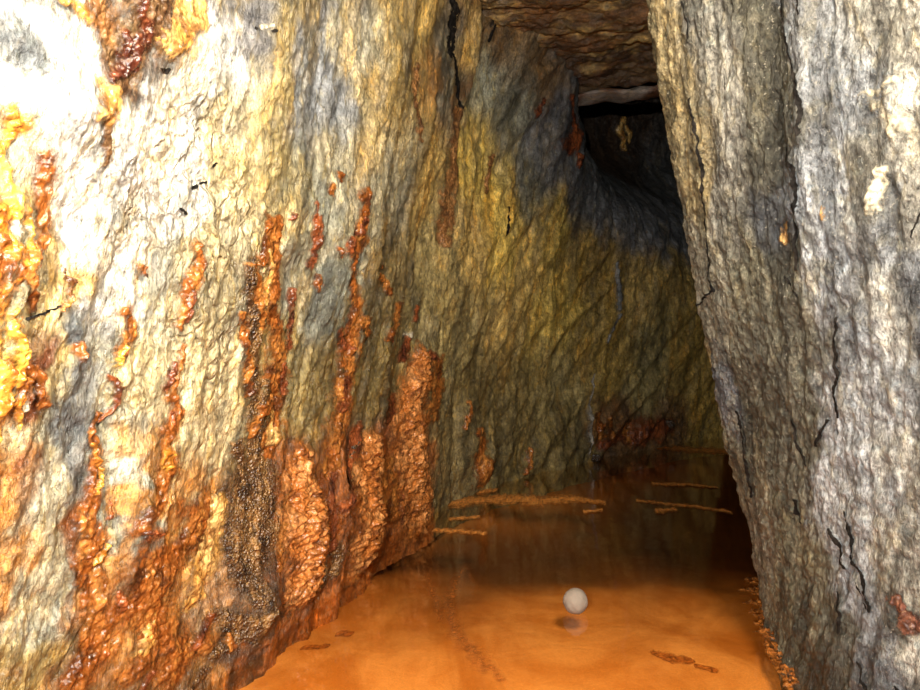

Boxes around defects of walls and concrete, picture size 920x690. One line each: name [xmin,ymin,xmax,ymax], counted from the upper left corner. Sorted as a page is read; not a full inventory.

rust [0,102,57,453]
rust [115,303,138,366]
rust [59,0,210,167]
rust [59,341,229,690]
rust [177,239,208,331]
rust [248,211,299,461]
rust [320,187,373,513]
crack [680,1,689,43]
crack [688,98,715,307]
crack [734,411,753,498]
crack [780,0,803,318]
crack [790,317,840,466]